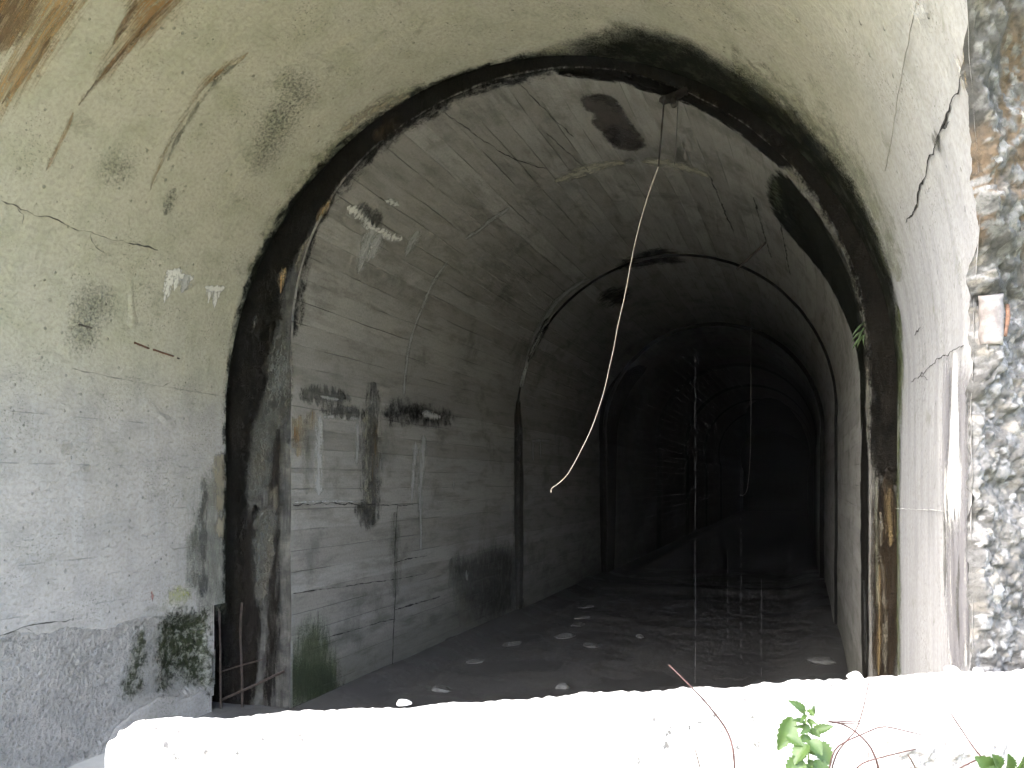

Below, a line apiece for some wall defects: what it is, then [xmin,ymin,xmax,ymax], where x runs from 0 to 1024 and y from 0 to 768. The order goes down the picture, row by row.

rust [0,0,85,116]
rust [47,0,180,169]
rust [150,53,248,190]
crack [906,76,961,223]
crack [1,200,156,253]
damp [163,268,193,302]
damp [205,285,225,308]
damp [212,26,902,706]
crack [912,345,964,382]
damp [198,480,208,597]
rust [870,477,898,677]